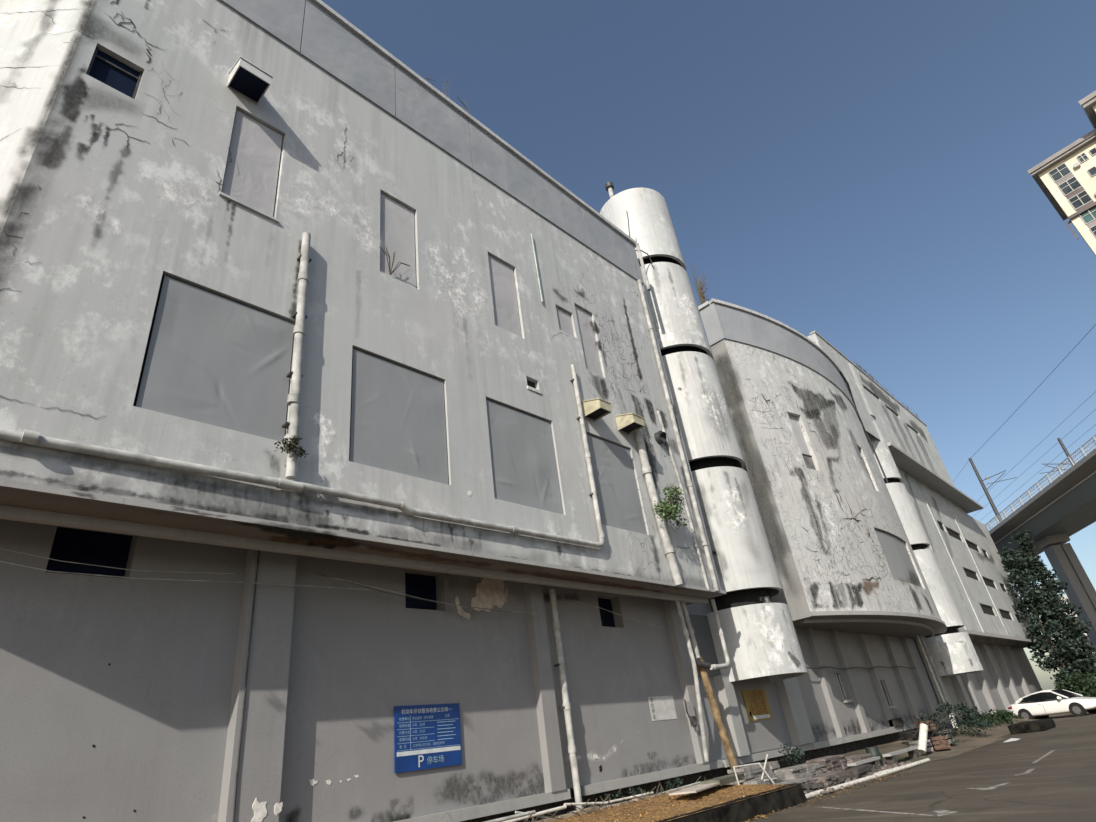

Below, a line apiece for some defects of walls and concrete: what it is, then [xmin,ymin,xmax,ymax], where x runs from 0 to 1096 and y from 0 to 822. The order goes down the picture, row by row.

crack [108,1,159,63]
damp [46,0,93,120]
damp [78,115,110,153]
crack [111,80,190,148]
damp [0,184,33,244]
damp [792,384,847,426]
damp [632,396,678,488]
damp [308,507,436,547]
peeling [455,578,508,619]
damp [811,582,863,608]
damp [443,767,544,804]
peeling [251,798,283,822]